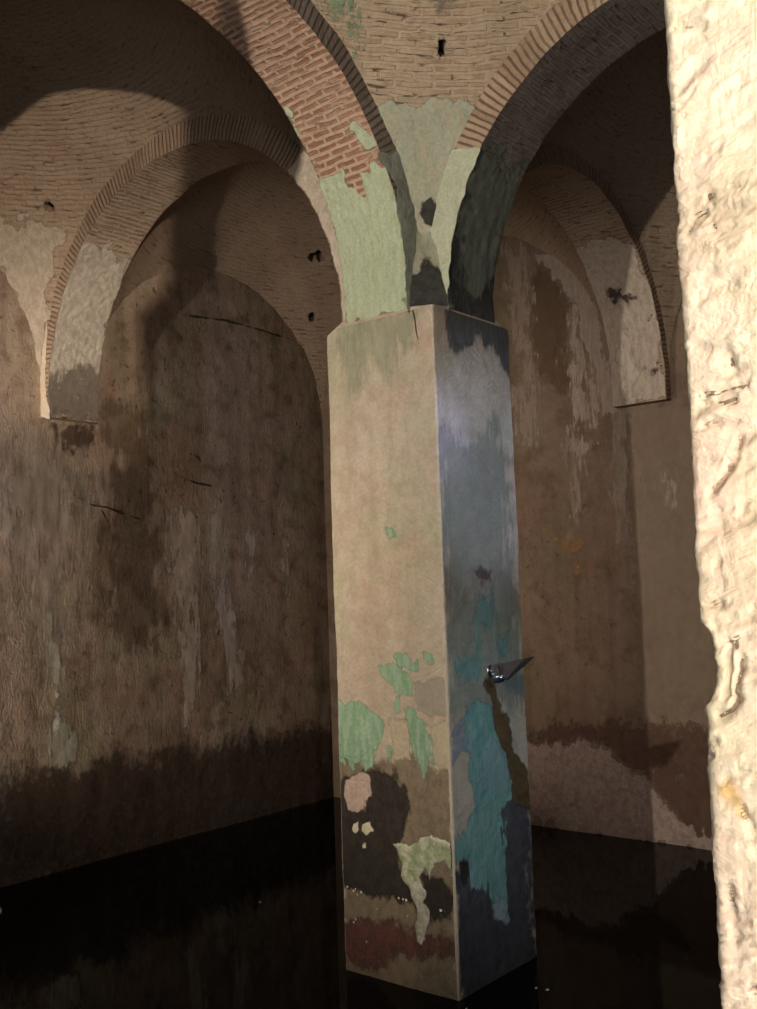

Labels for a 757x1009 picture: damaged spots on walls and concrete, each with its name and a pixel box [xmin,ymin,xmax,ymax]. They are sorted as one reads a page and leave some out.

flaking render [288,96,480,323]
flaking render [0,213,129,419]
crack [165,311,294,341]
water stain [0,364,100,698]
crack [78,497,140,522]
water stain [0,504,713,1001]
spalling [344,772,372,812]